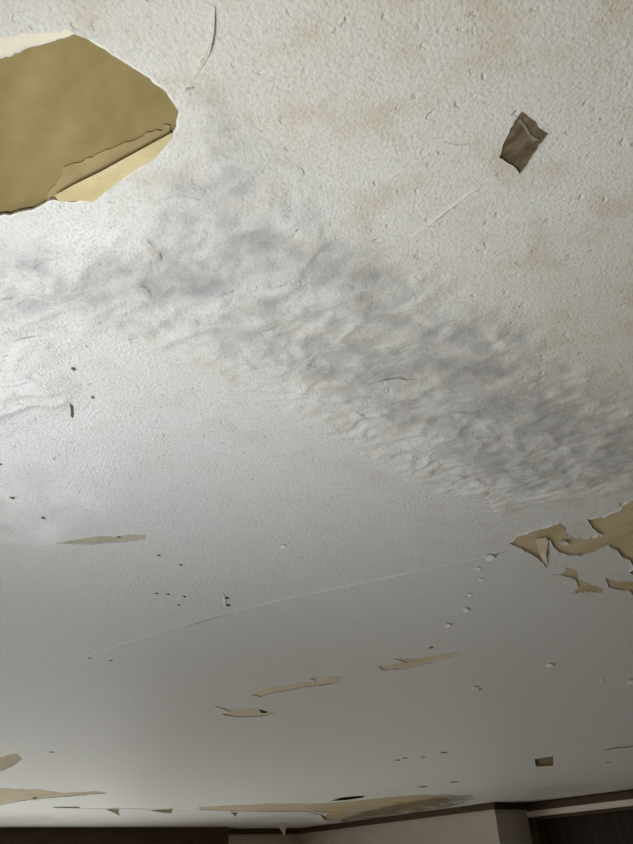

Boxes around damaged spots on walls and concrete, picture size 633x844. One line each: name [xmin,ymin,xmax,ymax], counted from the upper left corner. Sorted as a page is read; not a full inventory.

crack [184,8,216,94]
peeling [0,28,181,217]
spalling [500,112,548,173]
peeling [56,534,147,545]
peeling [509,499,633,597]
peeling [377,647,460,671]
peeling [215,706,275,717]
peeling [0,753,24,772]
peeling [0,788,107,808]
peeling [197,786,459,823]